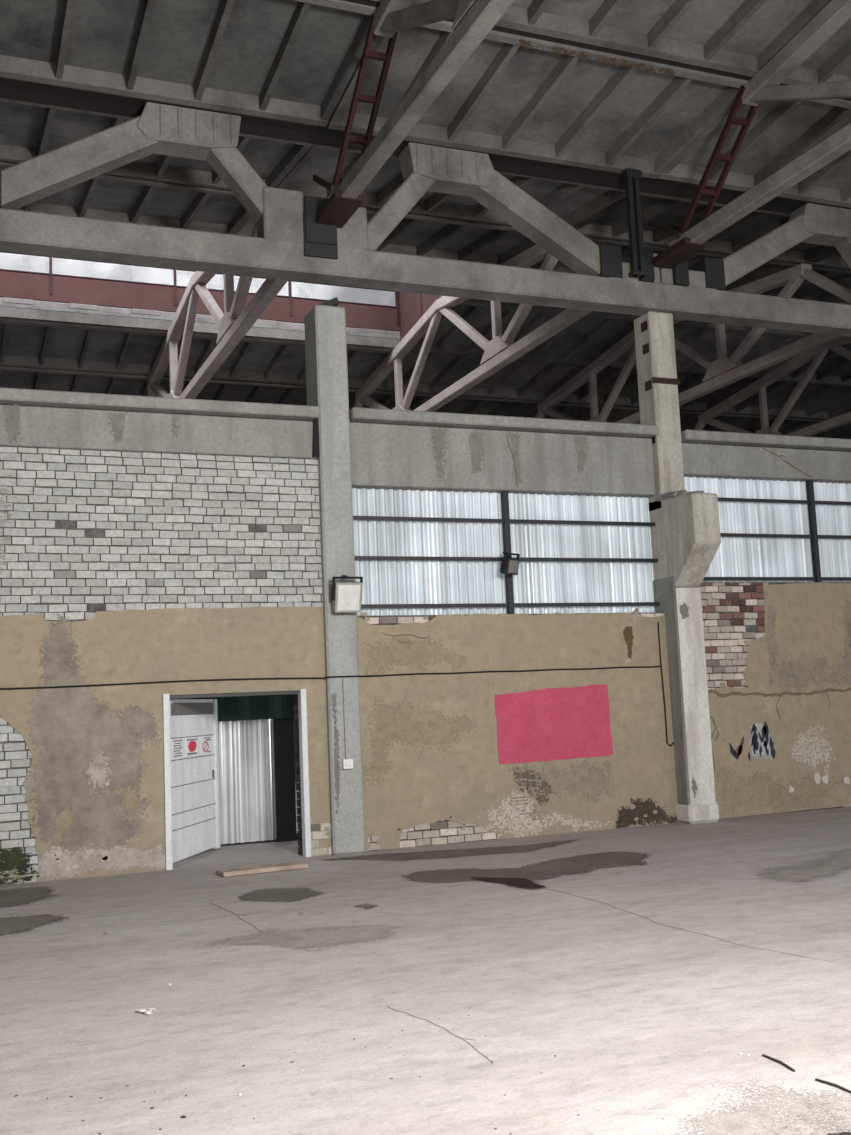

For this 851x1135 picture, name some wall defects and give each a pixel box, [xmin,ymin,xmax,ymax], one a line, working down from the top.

corrosion [623,626,634,662]
spalling [700,583,768,694]
leakage [24,614,163,852]
crack [708,677,851,770]
spalling [365,830,385,850]
spalling [395,815,501,848]
leakage [322,756,616,861]
leakage [471,877,545,888]
crack [387,1006,494,1064]
leakage [663,1076,851,1135]